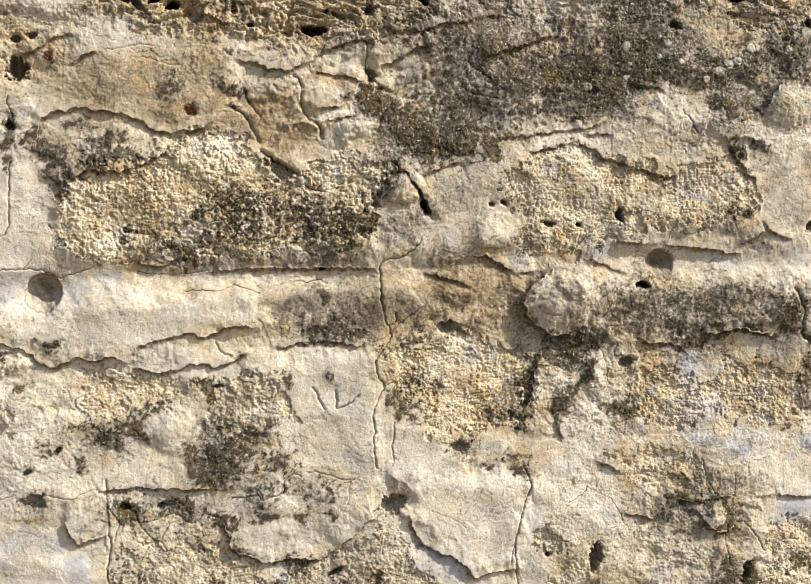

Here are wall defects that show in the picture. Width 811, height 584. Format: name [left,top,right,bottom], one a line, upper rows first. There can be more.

water stain [720,26,811,77]
water stain [349,85,400,116]
water stain [470,48,718,124]
water stain [702,85,779,122]
water stain [481,126,502,163]
water stain [729,135,771,165]
crack [397,169,432,214]
water stain [718,203,757,234]
spalling [0,318,302,441]
crack [372,241,425,468]
spalling [110,511,519,584]
crack [511,469,532,581]